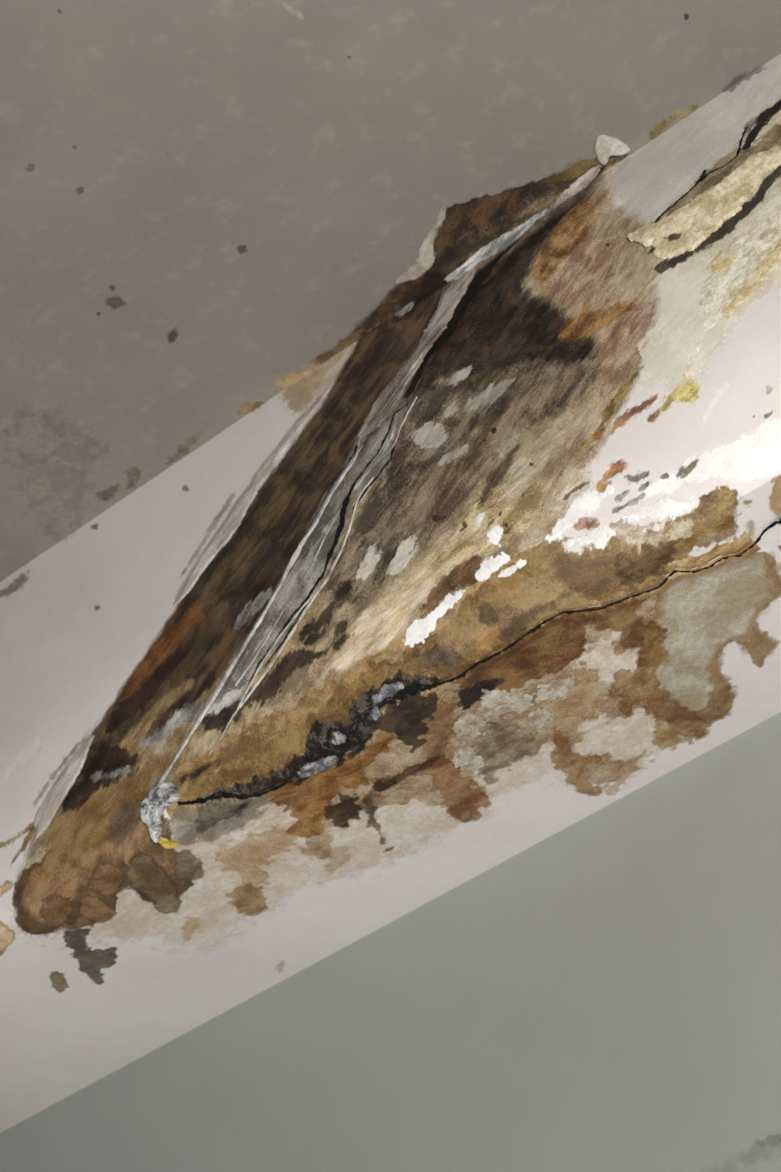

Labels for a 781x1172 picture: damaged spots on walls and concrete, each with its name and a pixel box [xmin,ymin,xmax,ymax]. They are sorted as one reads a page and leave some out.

peeling [31,735,130,846]
leakage [0,153,781,985]
peeling [138,54,781,849]
crack [177,516,781,816]
leakage [50,971,69,993]